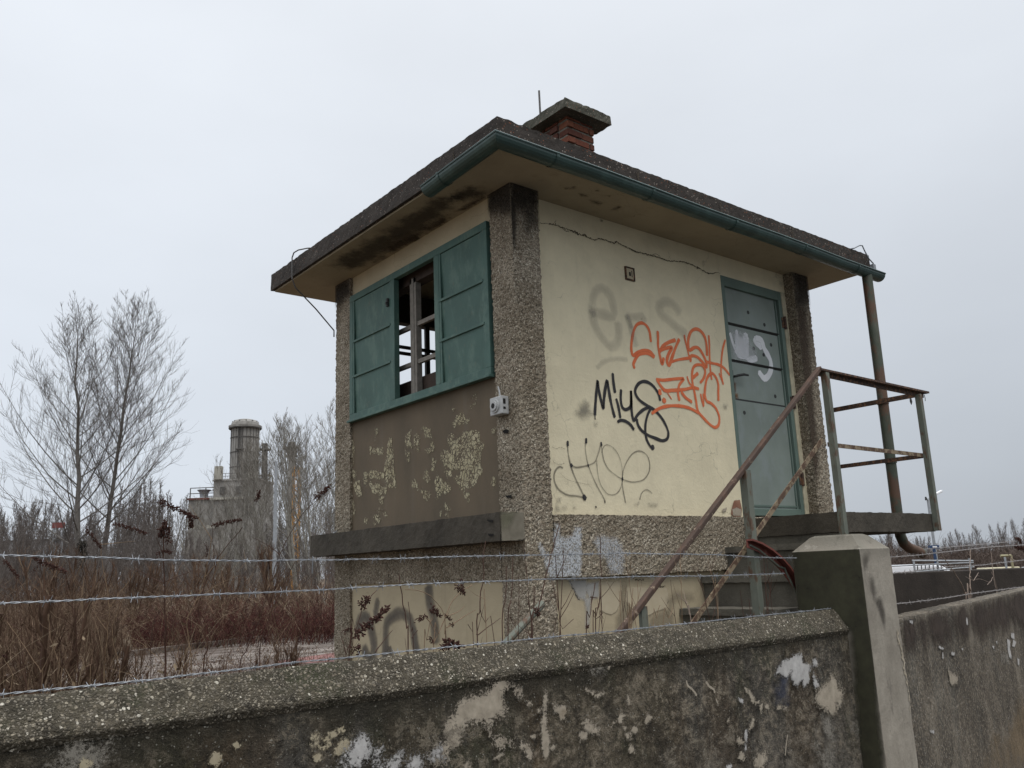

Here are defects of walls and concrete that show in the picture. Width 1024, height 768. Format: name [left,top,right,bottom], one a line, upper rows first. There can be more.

water stain [340,182,538,268]
crack [541,221,719,274]
peeling [352,394,496,525]
peeling [309,680,570,768]
peeling [578,694,653,754]
peeling [726,687,788,768]
peeling [774,652,858,768]